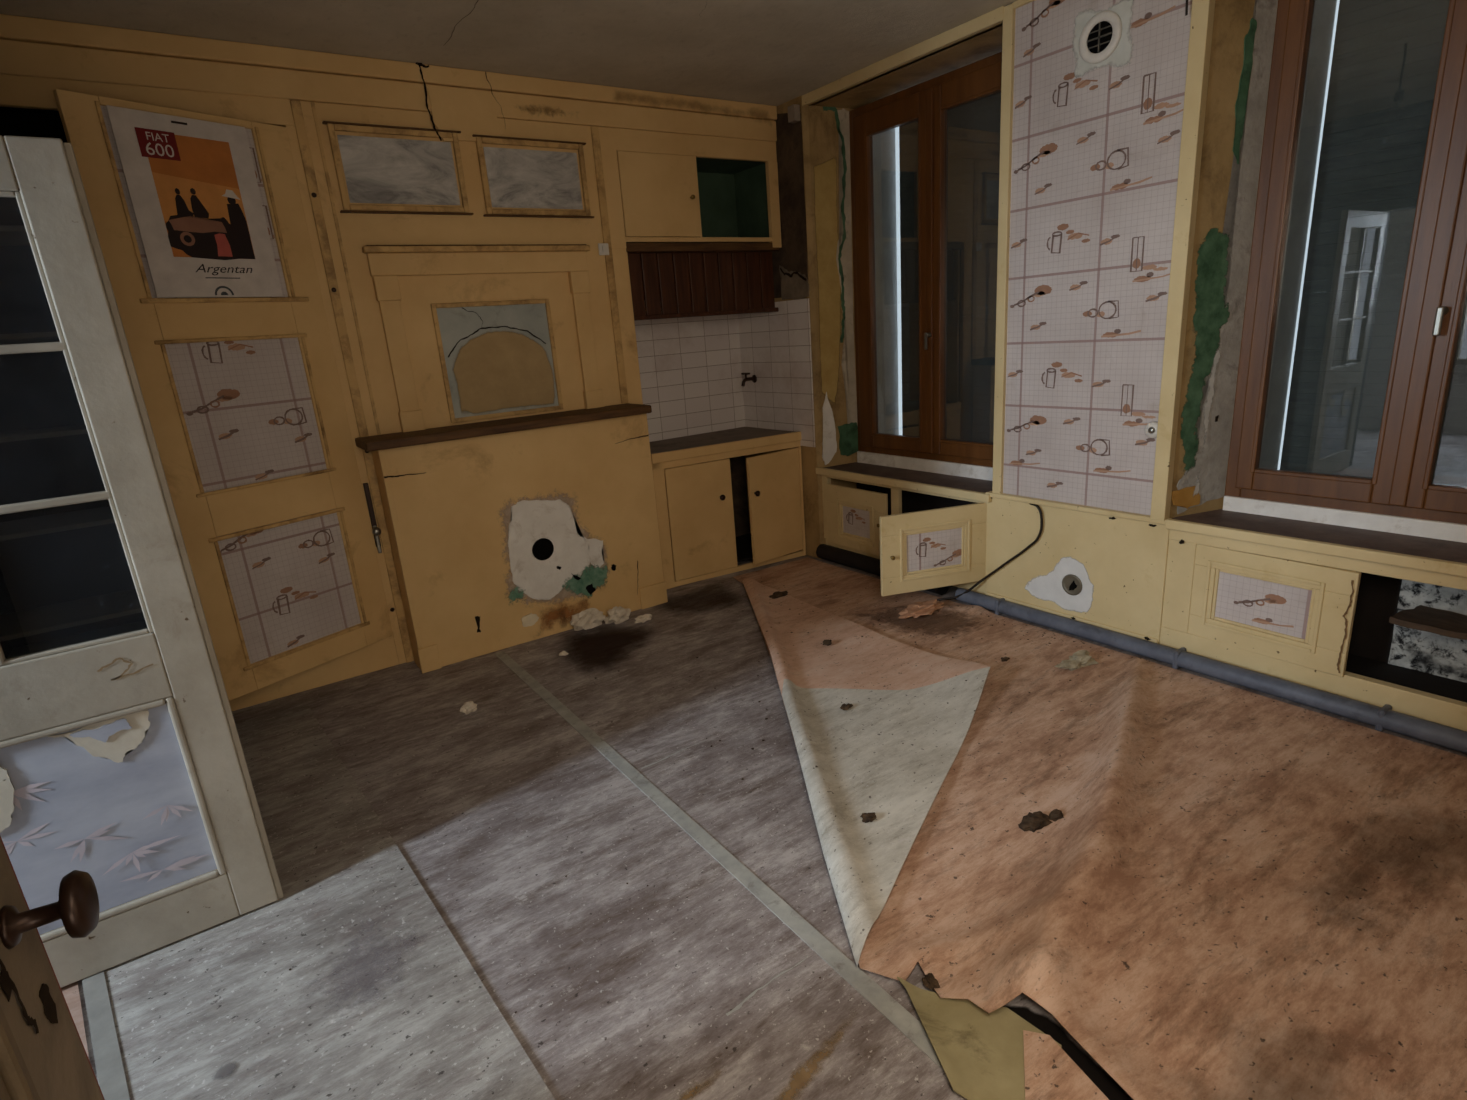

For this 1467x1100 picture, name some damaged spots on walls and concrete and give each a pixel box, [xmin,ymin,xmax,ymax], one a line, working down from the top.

crack [415,0,479,141]
peeling [1172,0,1278,514]
peeling [500,494,616,627]
damp [566,629,648,667]